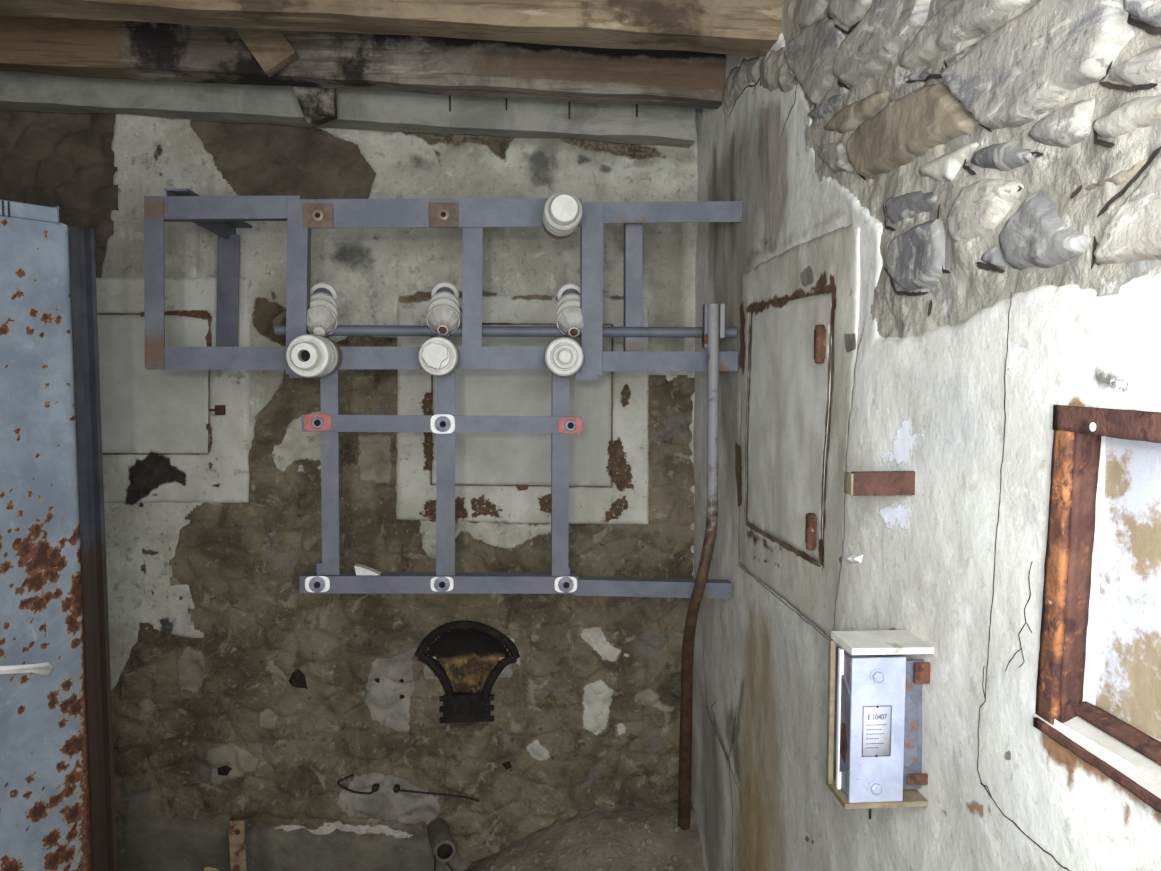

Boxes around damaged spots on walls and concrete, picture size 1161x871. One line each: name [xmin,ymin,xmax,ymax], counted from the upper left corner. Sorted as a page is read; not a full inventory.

spalling [190,120,376,199]
spalling [722,0,1161,338]
spalling [337,336,397,347]
rust [739,273,835,374]
rust [421,392,434,415]
rust [620,384,631,407]
rust [422,432,434,471]
rust [455,495,503,522]
rust [516,484,551,513]
rust [605,437,635,522]
spalling [111,369,695,862]
crack [977,292,1070,871]